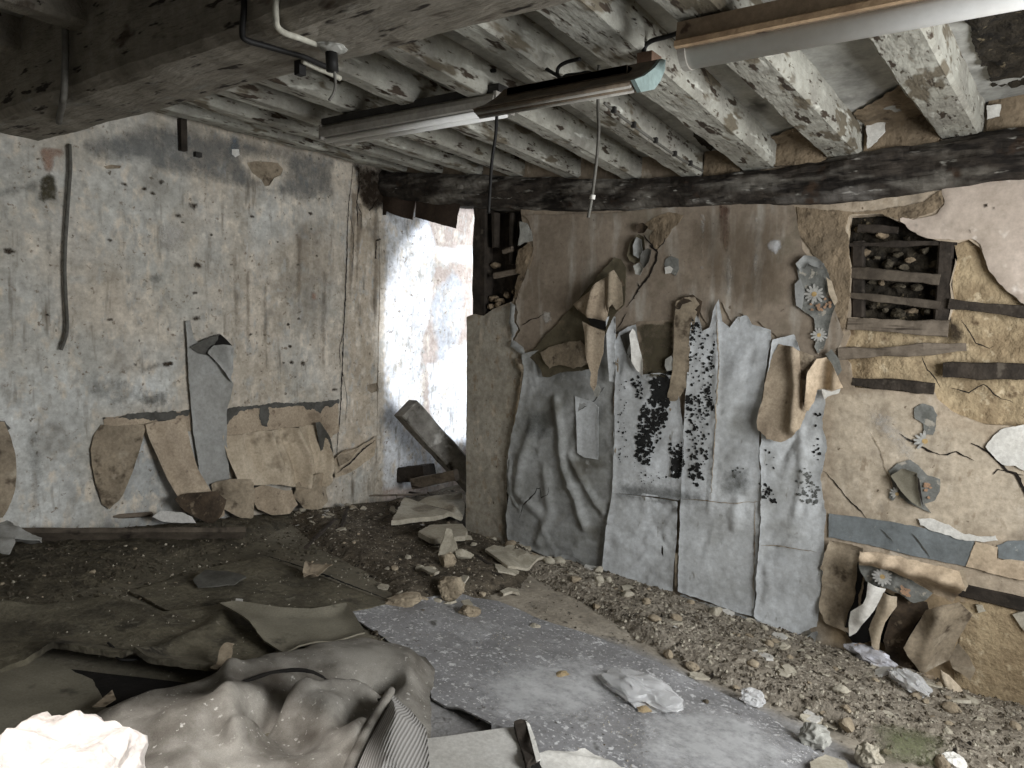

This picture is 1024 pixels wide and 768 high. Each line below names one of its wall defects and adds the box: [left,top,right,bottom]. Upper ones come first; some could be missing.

spalling [854,85,924,128]
spalling [693,132,714,151]
spalling [247,161,283,186]
spalling [797,190,944,331]
peeling [540,340,587,369]
peeling [575,396,599,460]
water stain [618,319,715,498]
peeling [757,344,814,442]
peeling [91,418,211,509]
water stain [795,468,821,505]
crack [821,470,866,518]
crack [870,433,1024,492]